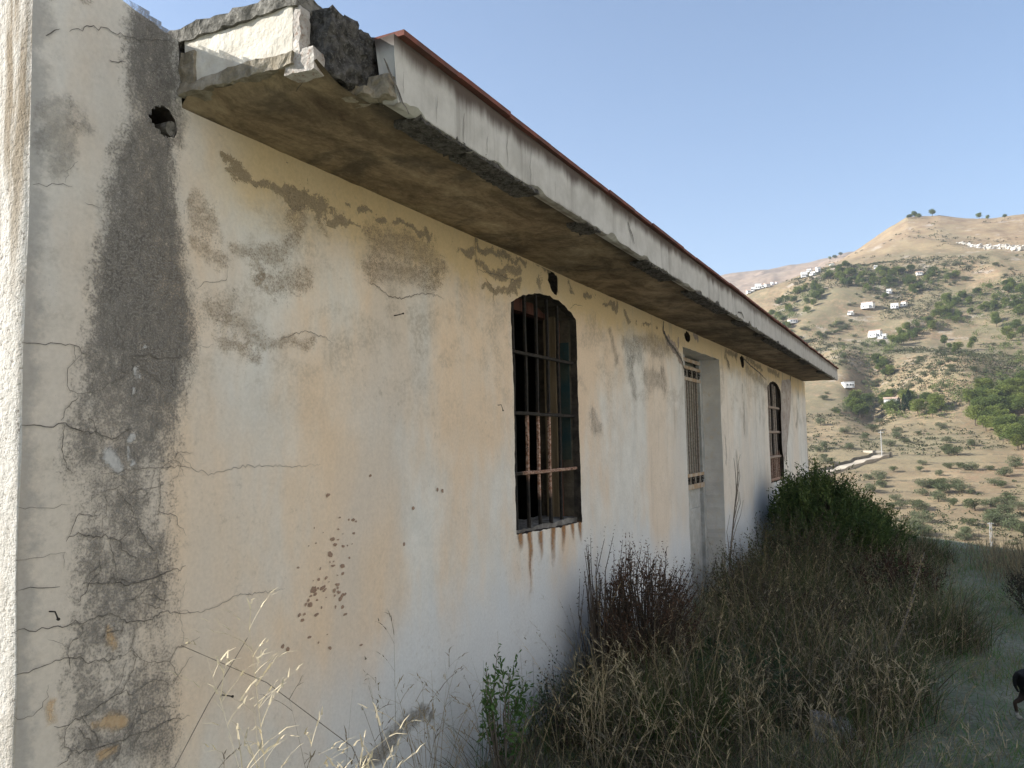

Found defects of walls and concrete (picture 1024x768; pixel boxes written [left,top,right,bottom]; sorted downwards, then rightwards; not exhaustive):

spalling [177,50,294,102]
spalling [394,114,540,198]
peeling [220,151,445,288]
peeling [457,238,550,297]
spalling [566,222,601,236]
spalling [629,260,826,374]
crack [23,332,212,473]
leakage [48,2,198,768]
rust [518,522,581,576]
crack [11,451,306,765]